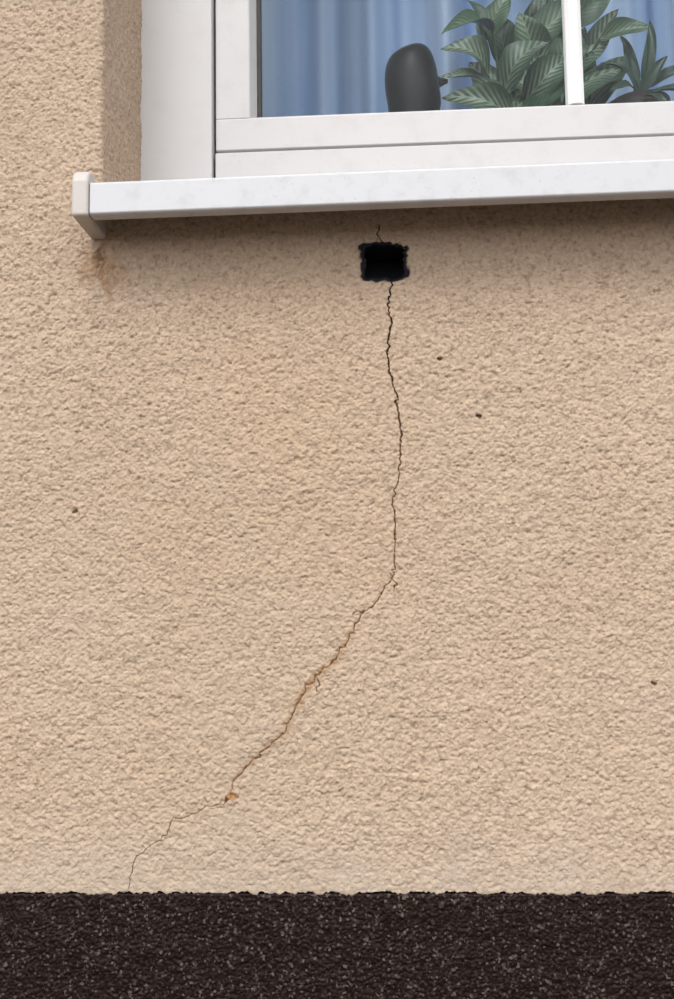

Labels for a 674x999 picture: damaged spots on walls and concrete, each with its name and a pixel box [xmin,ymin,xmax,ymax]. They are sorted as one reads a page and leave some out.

crack [128,282,403,889]